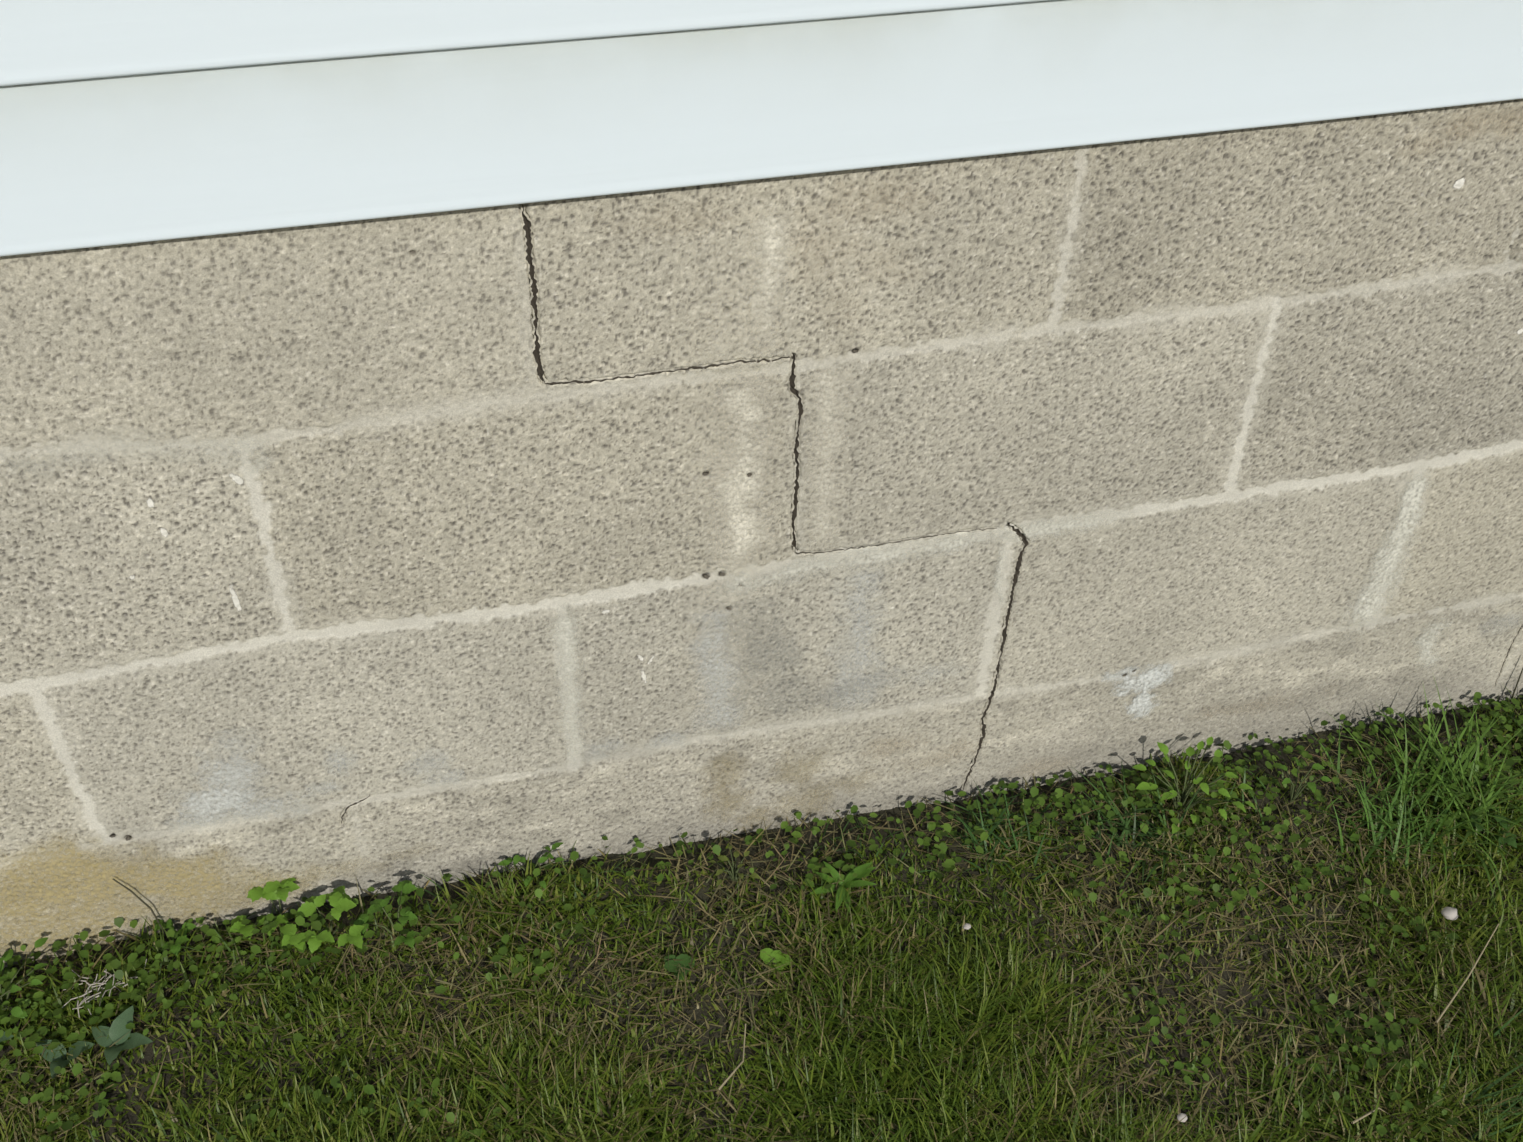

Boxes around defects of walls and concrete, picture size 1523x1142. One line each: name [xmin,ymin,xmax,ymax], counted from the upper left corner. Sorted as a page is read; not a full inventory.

crack [520,205,1029,791]